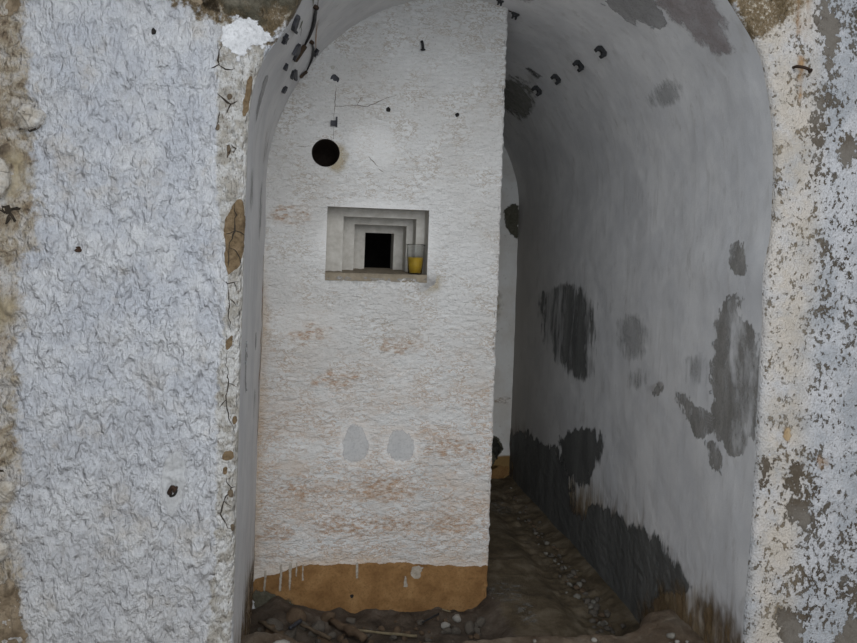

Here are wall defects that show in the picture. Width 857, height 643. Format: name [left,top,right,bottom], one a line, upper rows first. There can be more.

spalling [0,0,21,17]
peeling [602,0,731,54]
peeling [813,0,842,75]
peeling [807,93,857,184]
spalling [224,199,246,275]
peeling [503,204,519,238]
leakage [541,284,596,380]
peeling [783,452,815,534]
peeling [772,605,808,643]
peeling [832,580,857,643]